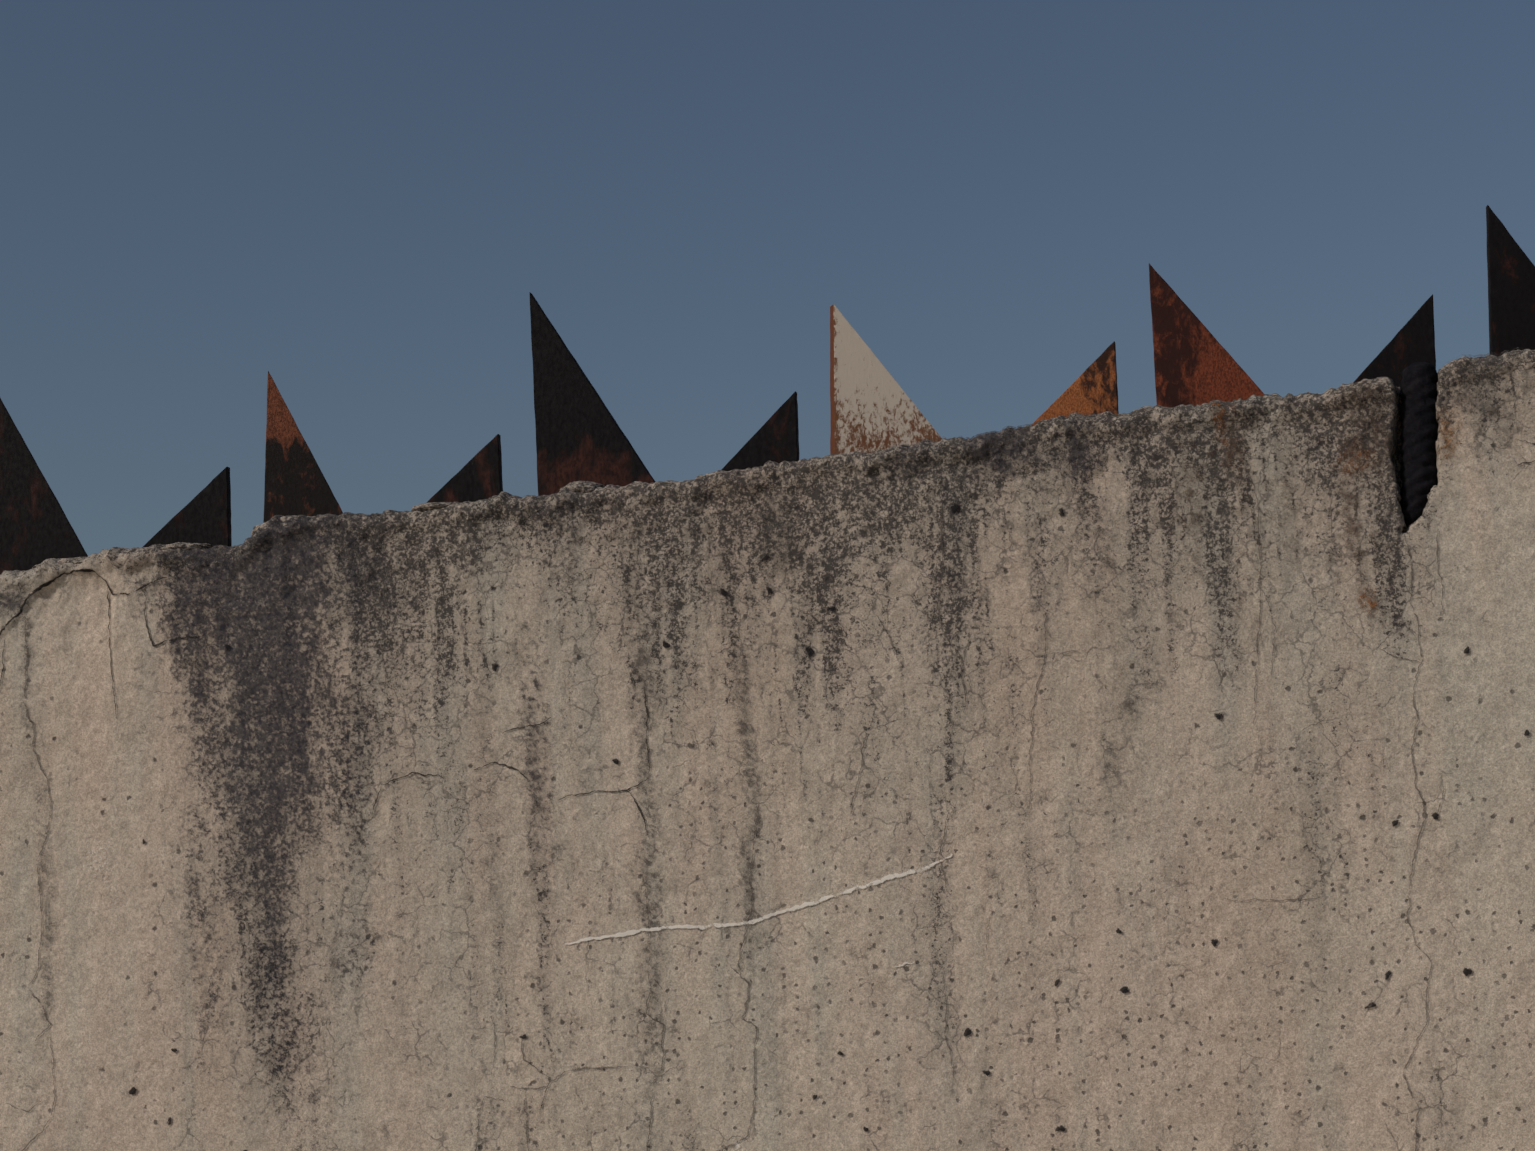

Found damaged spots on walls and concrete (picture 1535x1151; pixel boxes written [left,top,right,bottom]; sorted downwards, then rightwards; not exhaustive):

crack [937,481,971,709]
damp [896,412,1115,568]
damp [1339,388,1393,618]
crack [0,569,203,1150]
damp [130,512,399,1113]
damp [519,629,552,847]
damp [632,604,660,1053]
crack [475,795,954,1151]
damp [733,644,759,929]